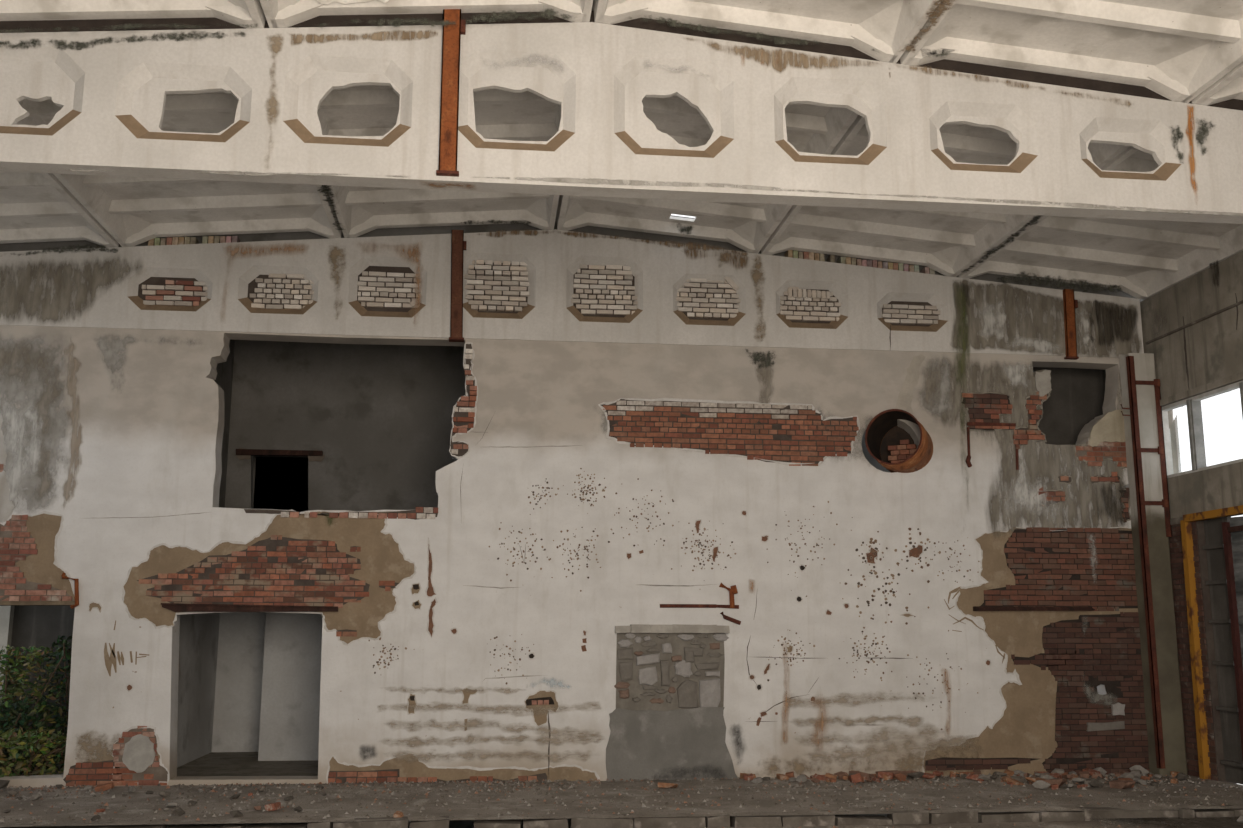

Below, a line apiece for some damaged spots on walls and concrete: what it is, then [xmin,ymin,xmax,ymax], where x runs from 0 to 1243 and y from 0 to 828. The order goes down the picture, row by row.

corrosion [1186,107,1196,190]
leakage [1171,120,1213,163]
leakage [0,244,138,322]
leakage [0,338,81,510]
spalling [449,342,478,459]
peeling [598,398,860,466]
peeling [961,370,1052,449]
leakage [922,215,1140,567]
peeling [0,511,103,613]
peeling [104,507,438,676]
peeling [825,410,1150,777]
peeling [63,725,170,786]